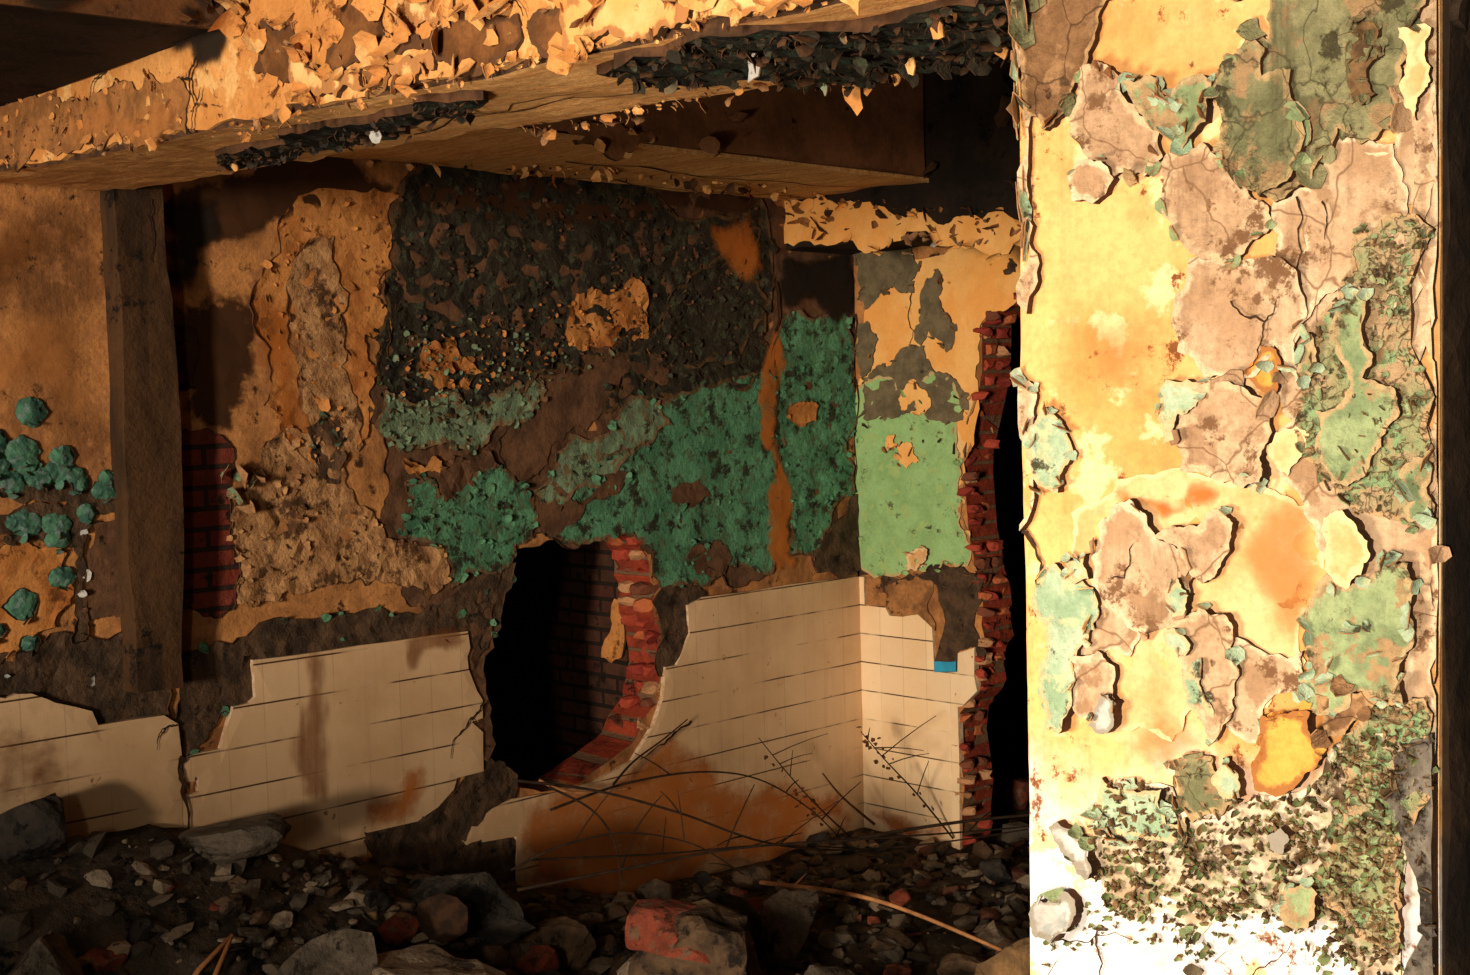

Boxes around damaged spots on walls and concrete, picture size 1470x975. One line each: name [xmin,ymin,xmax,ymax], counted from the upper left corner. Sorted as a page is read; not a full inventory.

peeling [174,0,246,37]
spalling [0,68,221,172]
peeling [564,105,662,162]
spalling [1003,258,1017,275]
peeling [770,286,1011,692]
peeling [985,367,1078,531]
peeling [0,482,172,724]
crack [156,724,191,828]
peeling [363,621,519,884]
corrosion [525,741,841,895]
crack [1057,931,1132,975]
crack [1252,946,1290,975]